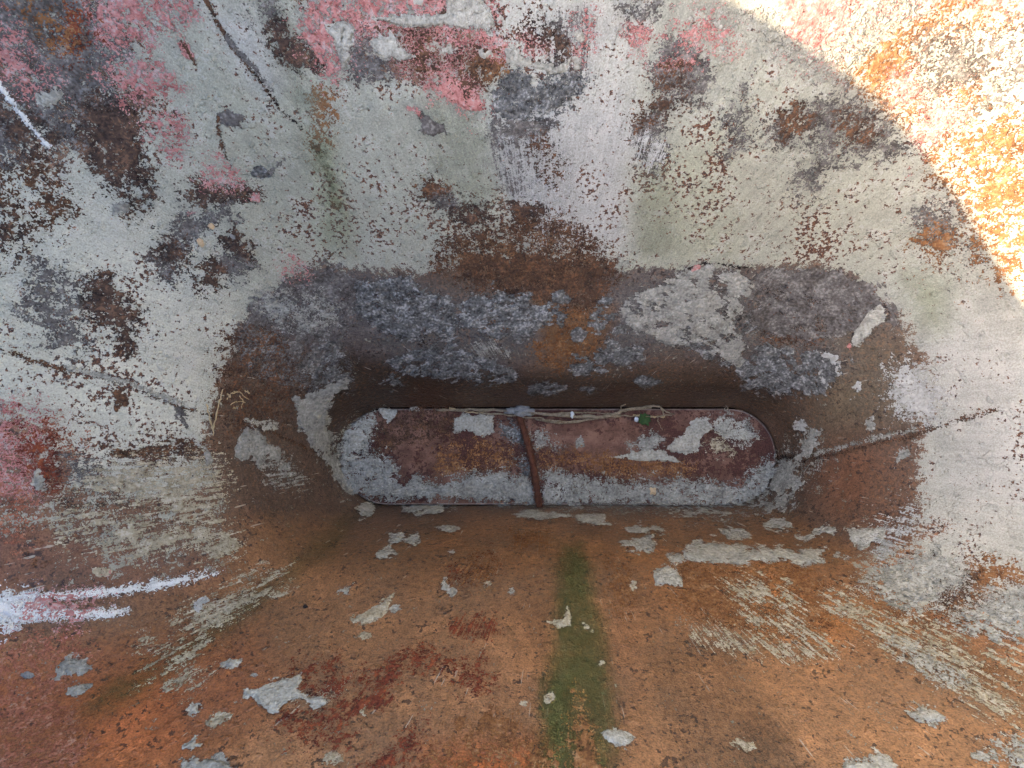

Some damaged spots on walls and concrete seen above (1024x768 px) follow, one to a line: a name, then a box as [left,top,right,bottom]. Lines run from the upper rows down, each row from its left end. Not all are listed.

peeling [0,0,212,176]
corrosion [708,14,1024,305]
peeling [139,186,245,292]
corrosion [410,120,629,379]
corrosion [367,399,706,487]
peeling [818,343,852,389]
crack [777,407,999,463]
peeling [0,565,124,768]
peeling [375,529,421,559]
corrosion [265,610,580,768]
damp [543,549,609,768]
corrosion [596,541,845,651]